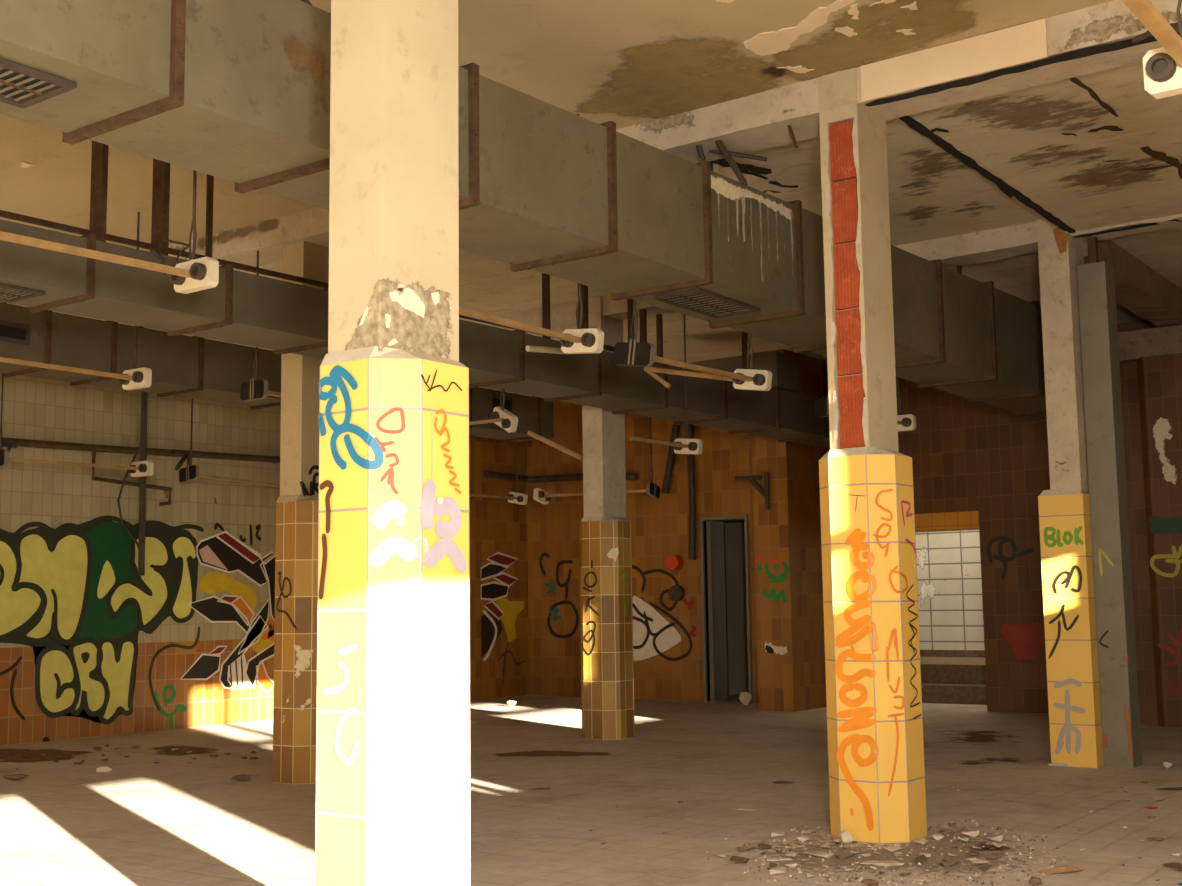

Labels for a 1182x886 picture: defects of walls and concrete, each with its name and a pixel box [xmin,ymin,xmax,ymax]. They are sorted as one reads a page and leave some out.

water stain [579,0,974,119]
peeling [744,0,918,74]
water stain [901,150,990,220]
water stain [938,96,1109,130]
crack [865,22,1182,238]
water stain [1012,145,1167,192]
water stain [711,175,793,282]
flaking render [345,279,452,359]